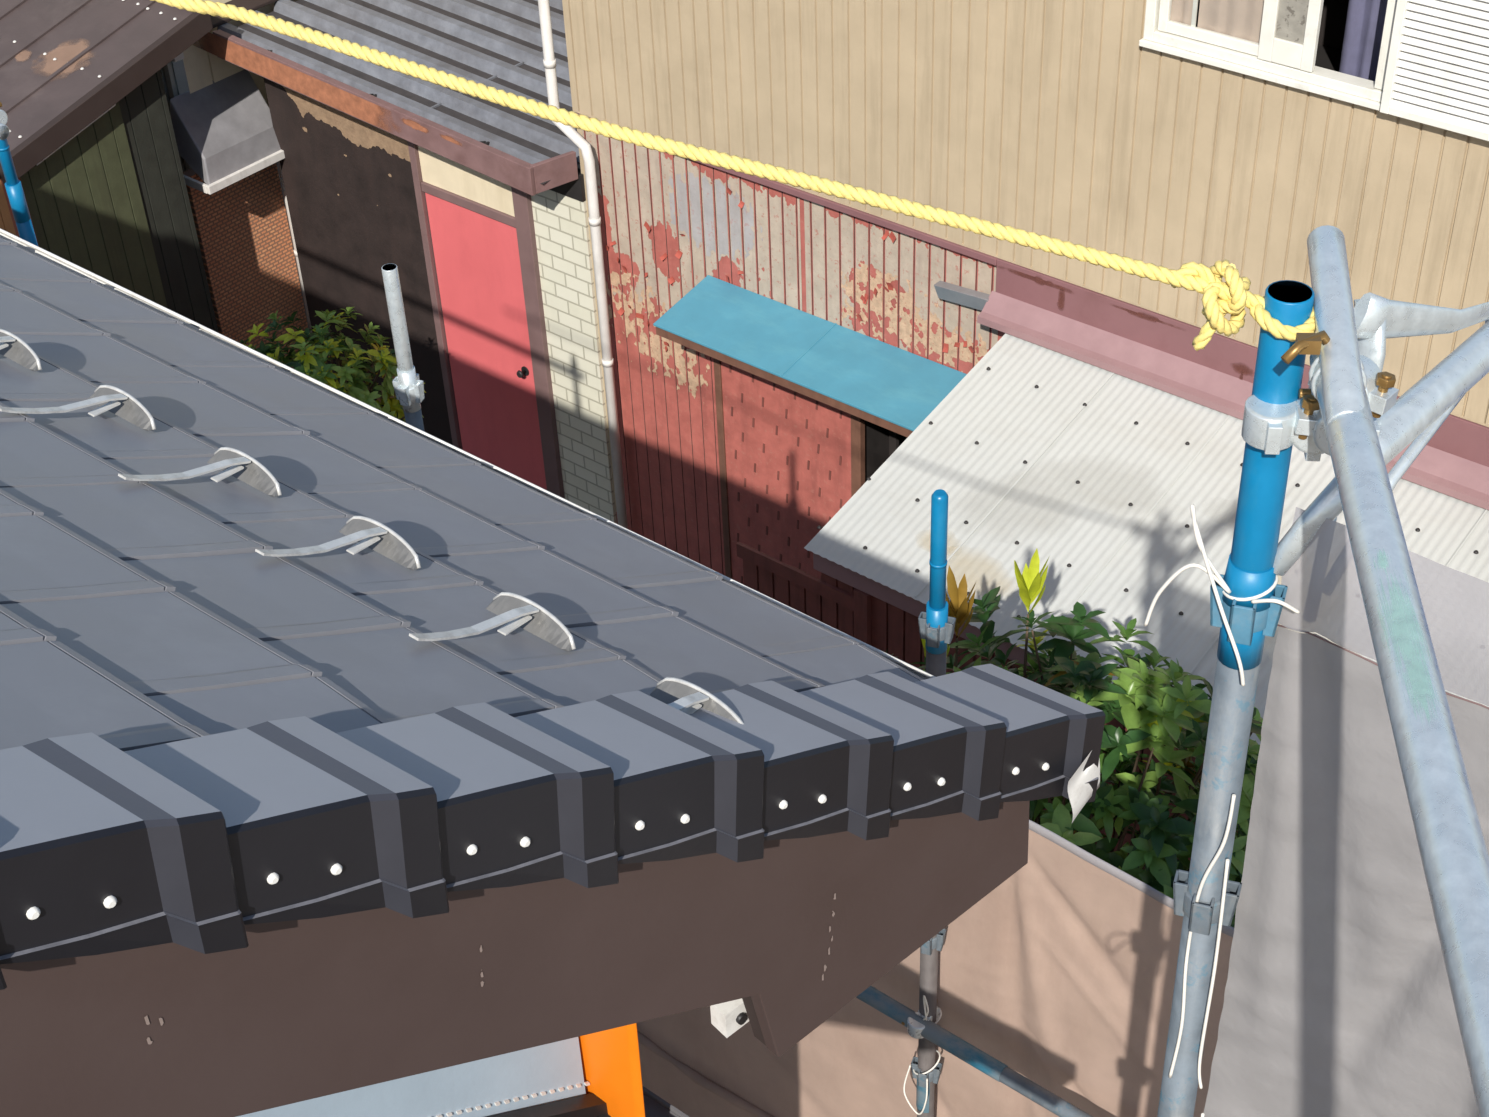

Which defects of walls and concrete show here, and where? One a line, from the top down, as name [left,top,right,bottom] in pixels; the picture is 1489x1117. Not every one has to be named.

peeling [283,86,411,163]
peeling [582,130,998,403]